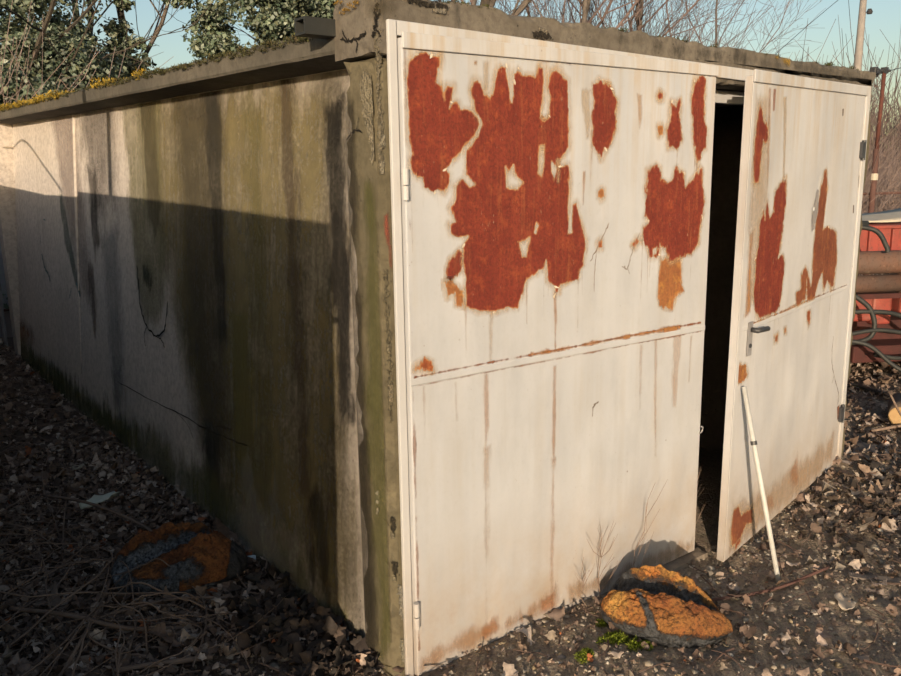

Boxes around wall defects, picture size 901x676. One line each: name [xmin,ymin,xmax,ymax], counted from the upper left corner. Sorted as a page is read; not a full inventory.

water stain [56,116,96,337]
water stain [84,108,111,249]
water stain [141,101,159,231]
crack [137,268,168,348]
water stain [179,91,225,490]
water stain [326,101,377,648]
corrosion [407,51,586,313]
corrosion [631,75,709,310]
corrosion [753,89,786,184]
corrosion [746,169,843,325]
corrosion [731,443,832,550]
corrosion [459,621,497,648]